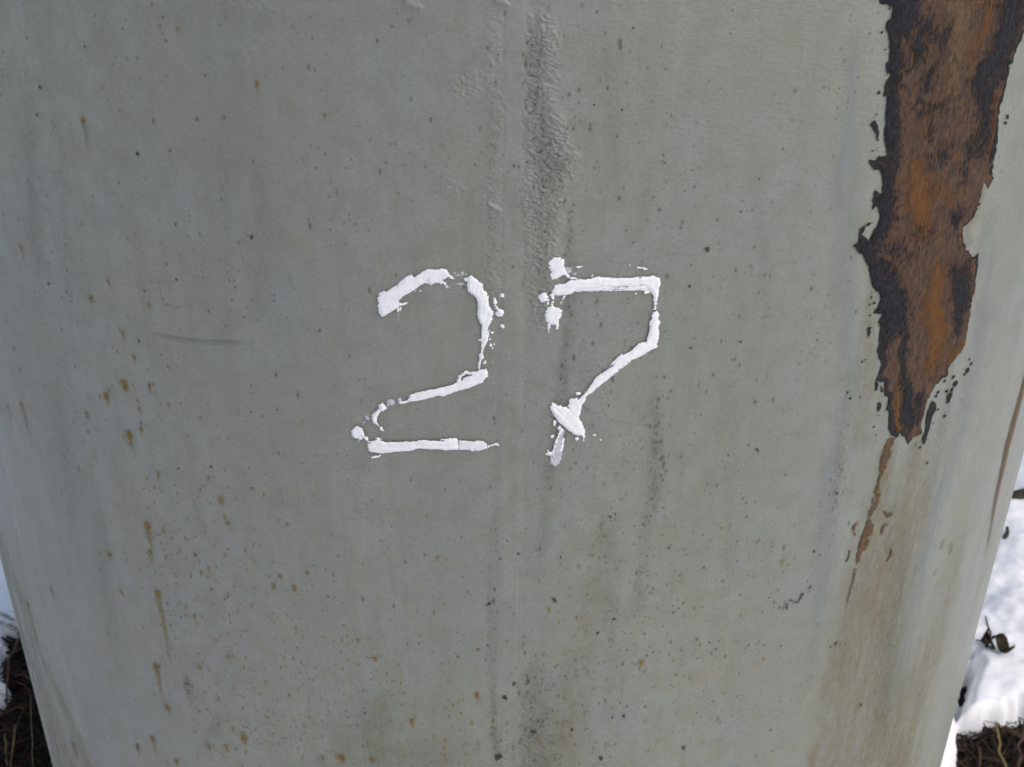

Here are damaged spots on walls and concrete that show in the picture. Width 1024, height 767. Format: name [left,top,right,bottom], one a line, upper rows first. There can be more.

peeling [854,0,1024,449]
rust [846,438,896,601]